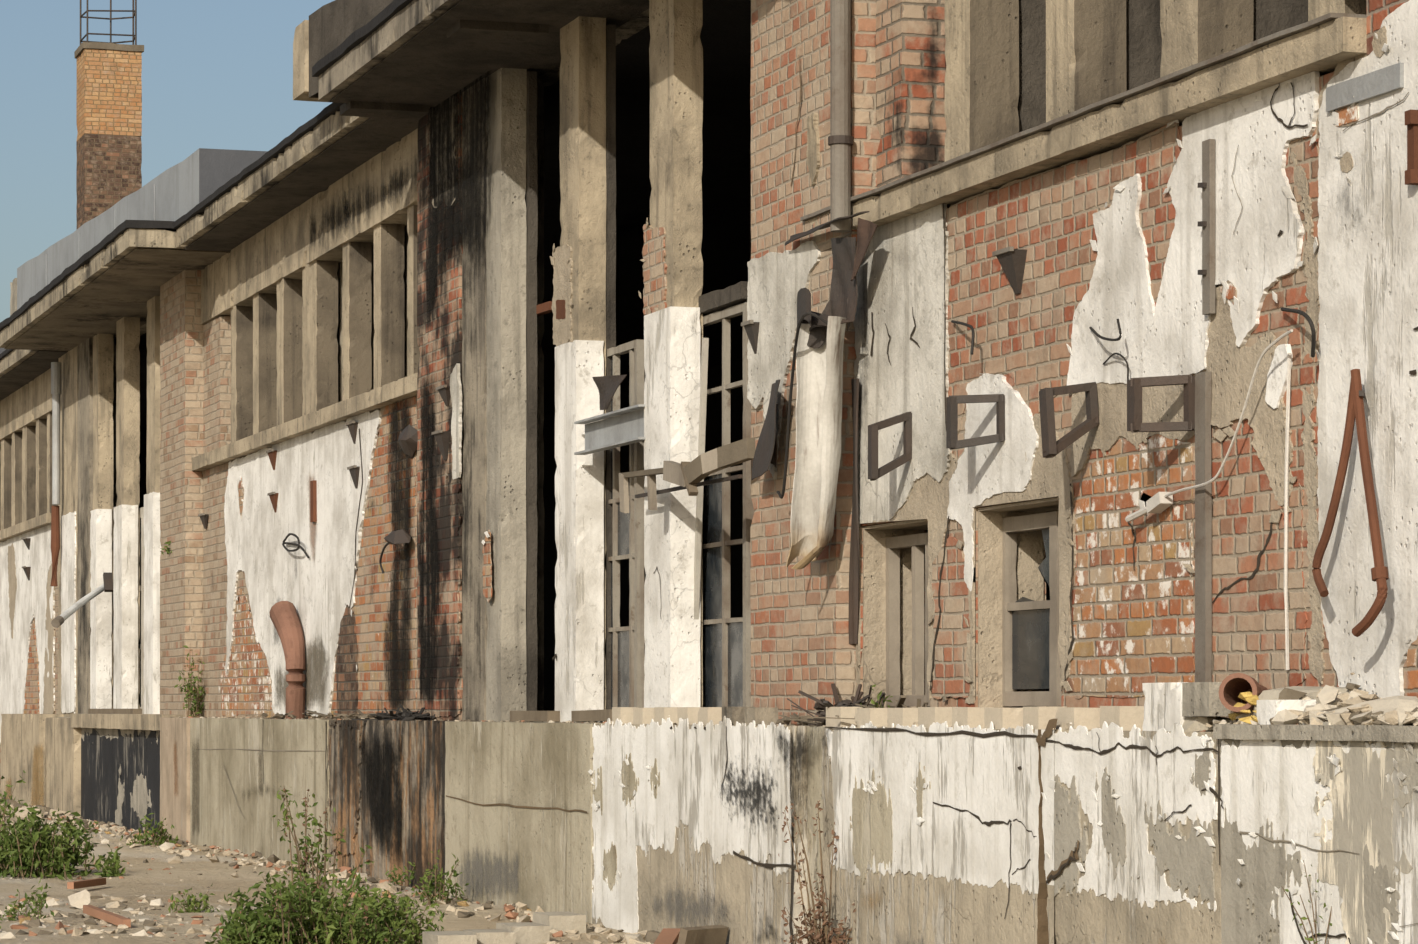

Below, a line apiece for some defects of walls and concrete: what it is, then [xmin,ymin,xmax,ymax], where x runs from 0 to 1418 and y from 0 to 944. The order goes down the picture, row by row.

flaking render [638,218,667,315]
flaking render [947,120,1183,454]
flaking render [1272,134,1354,432]
flaking render [219,588,274,718]
peeling [588,753,660,816]
crack [733,733,796,944]
peeling [849,768,896,885]
peeling [1041,767,1140,897]
crack [825,483,1359,944]
peeling [1144,800,1216,910]
peeling [1189,737,1211,796]
peeling [1236,818,1311,944]